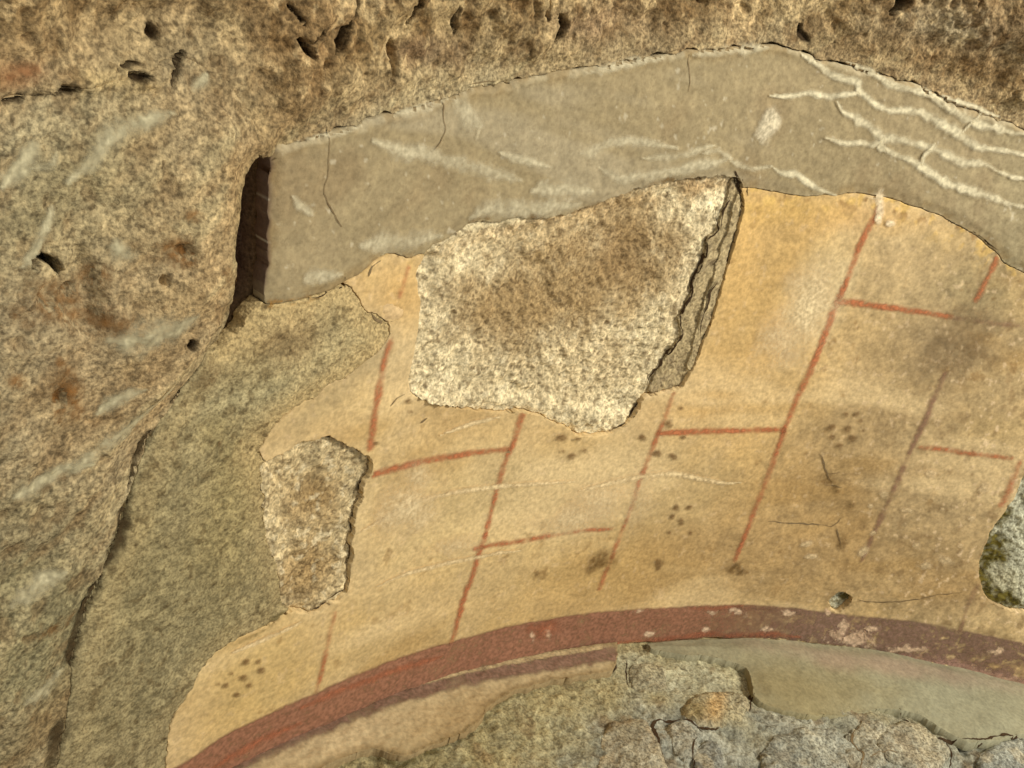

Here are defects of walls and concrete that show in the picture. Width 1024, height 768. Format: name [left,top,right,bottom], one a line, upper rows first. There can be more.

water stain [756,108,781,143]
flaking render [408,175,741,434]
flaking render [259,436,369,612]
flaking render [979,476,1024,609]